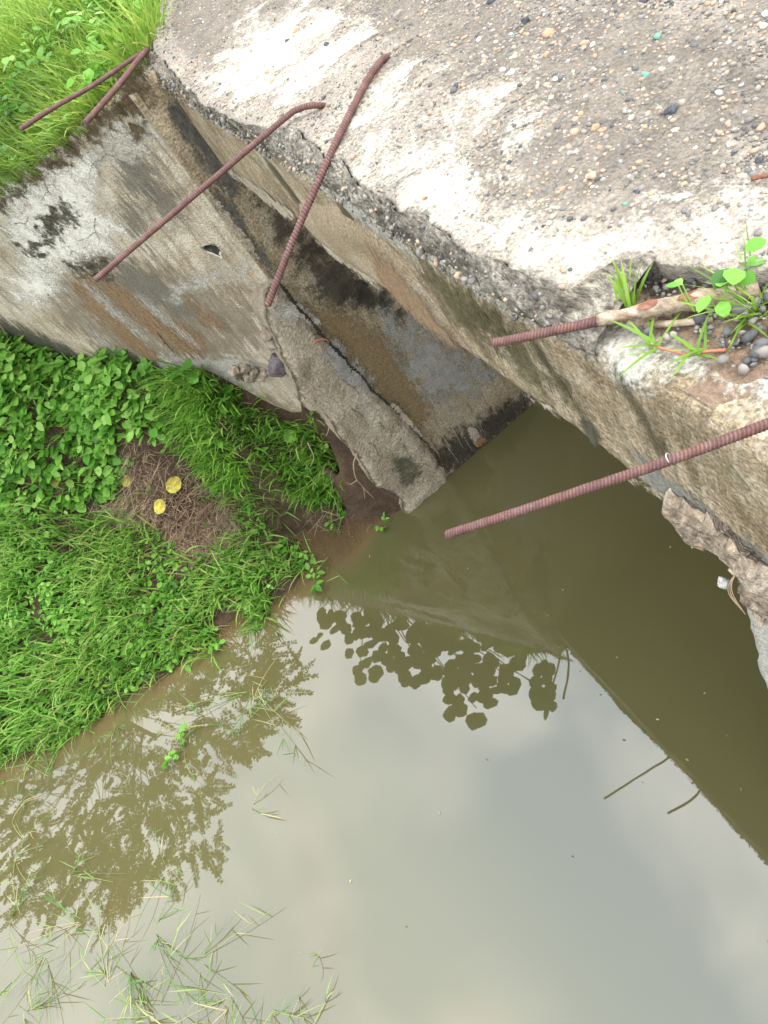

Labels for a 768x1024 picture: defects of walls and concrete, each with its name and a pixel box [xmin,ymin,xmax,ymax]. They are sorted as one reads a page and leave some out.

water stain [0,102,601,473]
spalling [19,42,654,358]
crack [280,283,452,476]
spalling [444,418,768,627]
water stain [595,323,719,515]
water stain [728,379,768,410]